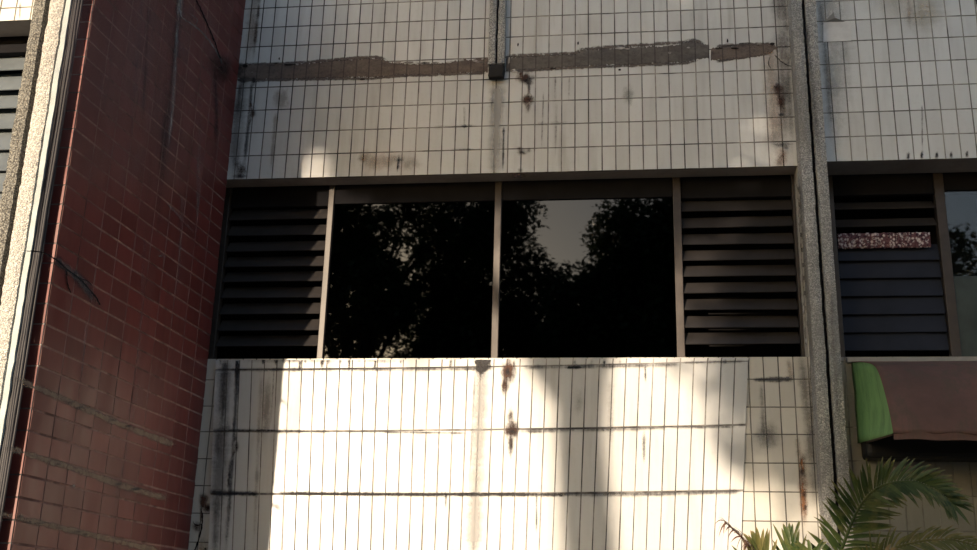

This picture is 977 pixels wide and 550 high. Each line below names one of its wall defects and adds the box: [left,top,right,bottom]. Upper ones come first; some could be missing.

spalling [237,55,488,82]
spalling [506,39,777,73]
rust [518,72,533,110]
rust [774,84,784,116]
crack [28,250,100,305]
rust [502,362,515,391]
water stain [567,361,646,377]
water stain [212,360,390,521]
rust [506,412,518,449]